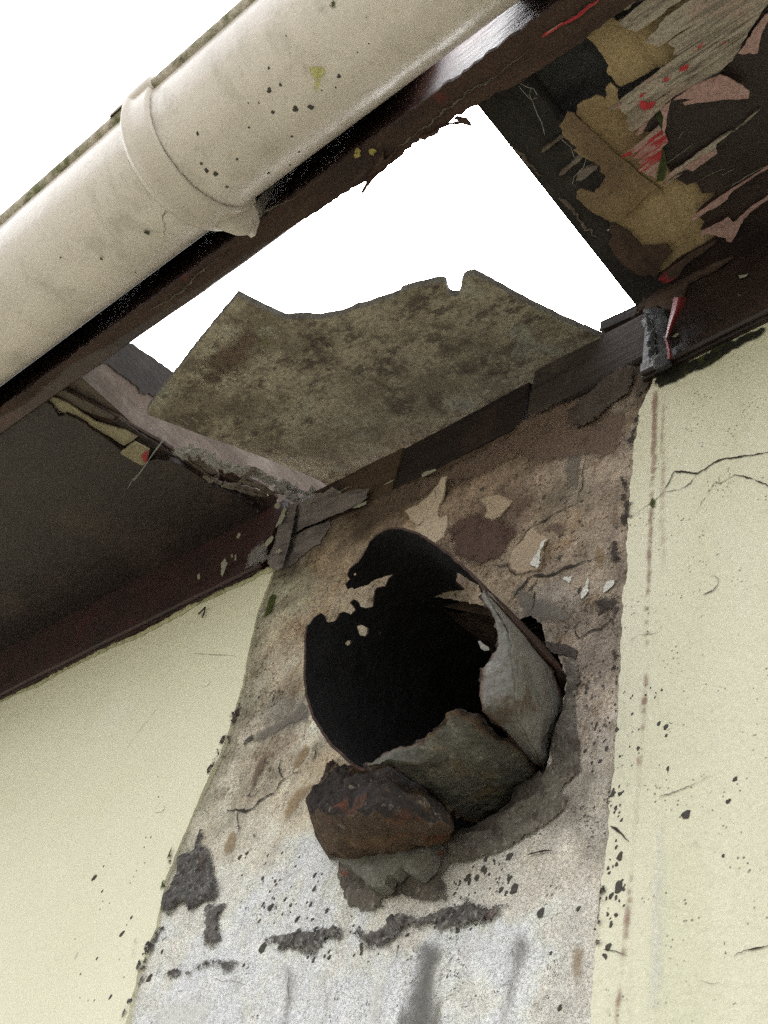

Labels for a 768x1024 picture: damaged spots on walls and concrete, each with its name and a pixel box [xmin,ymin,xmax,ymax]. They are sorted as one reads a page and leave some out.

peeling [607,0,768,132]
damp [207,333,259,381]
damp [172,443,317,502]
damp [510,400,624,488]
crack [632,452,768,516]
flaking render [131,366,652,1024]